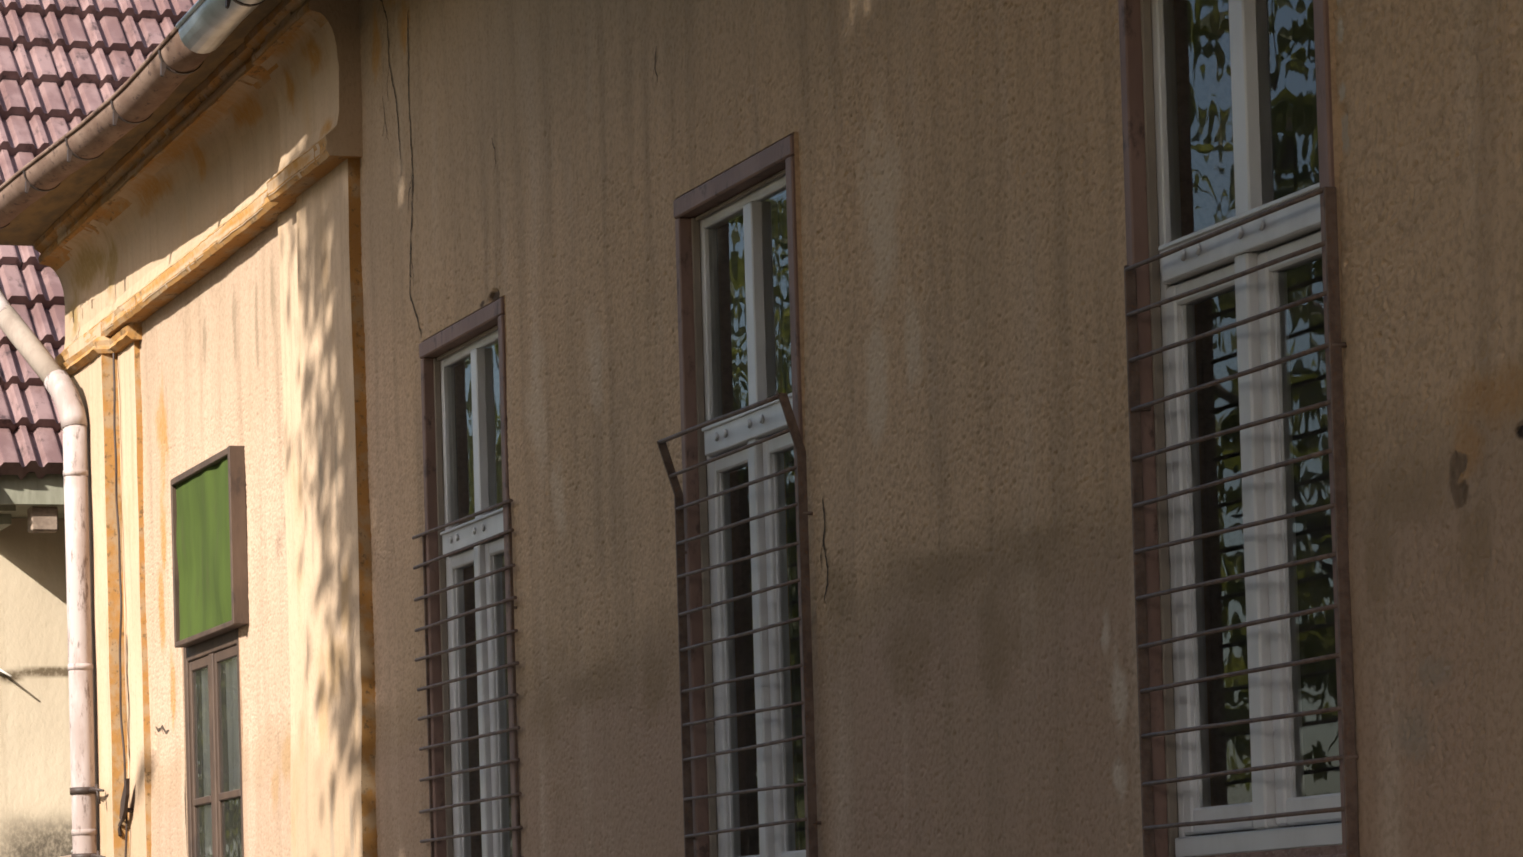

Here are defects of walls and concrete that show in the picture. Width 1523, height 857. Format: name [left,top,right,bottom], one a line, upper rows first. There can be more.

crack [380,0,422,338]